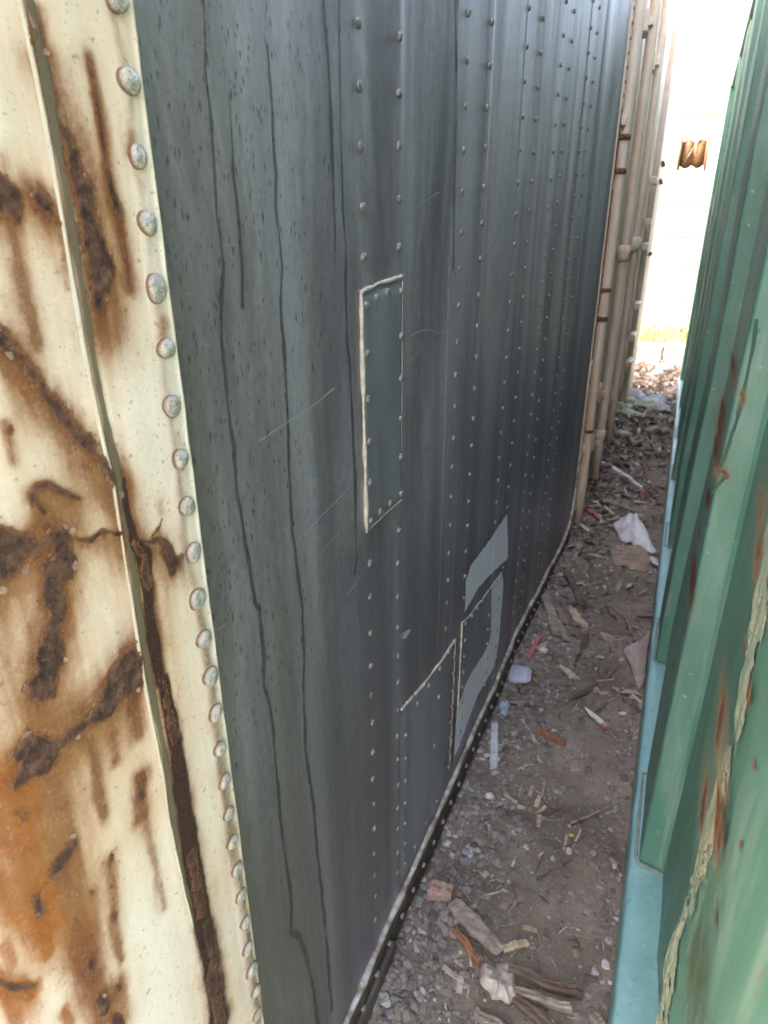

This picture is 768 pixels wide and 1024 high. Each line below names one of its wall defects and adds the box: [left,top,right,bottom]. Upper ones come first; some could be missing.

peeling [714,399,729,477]
corrosion [0,3,230,1024]
corrosion [215,722,235,862]
peeling [656,492,768,1024]
corrosion [238,874,261,1024]